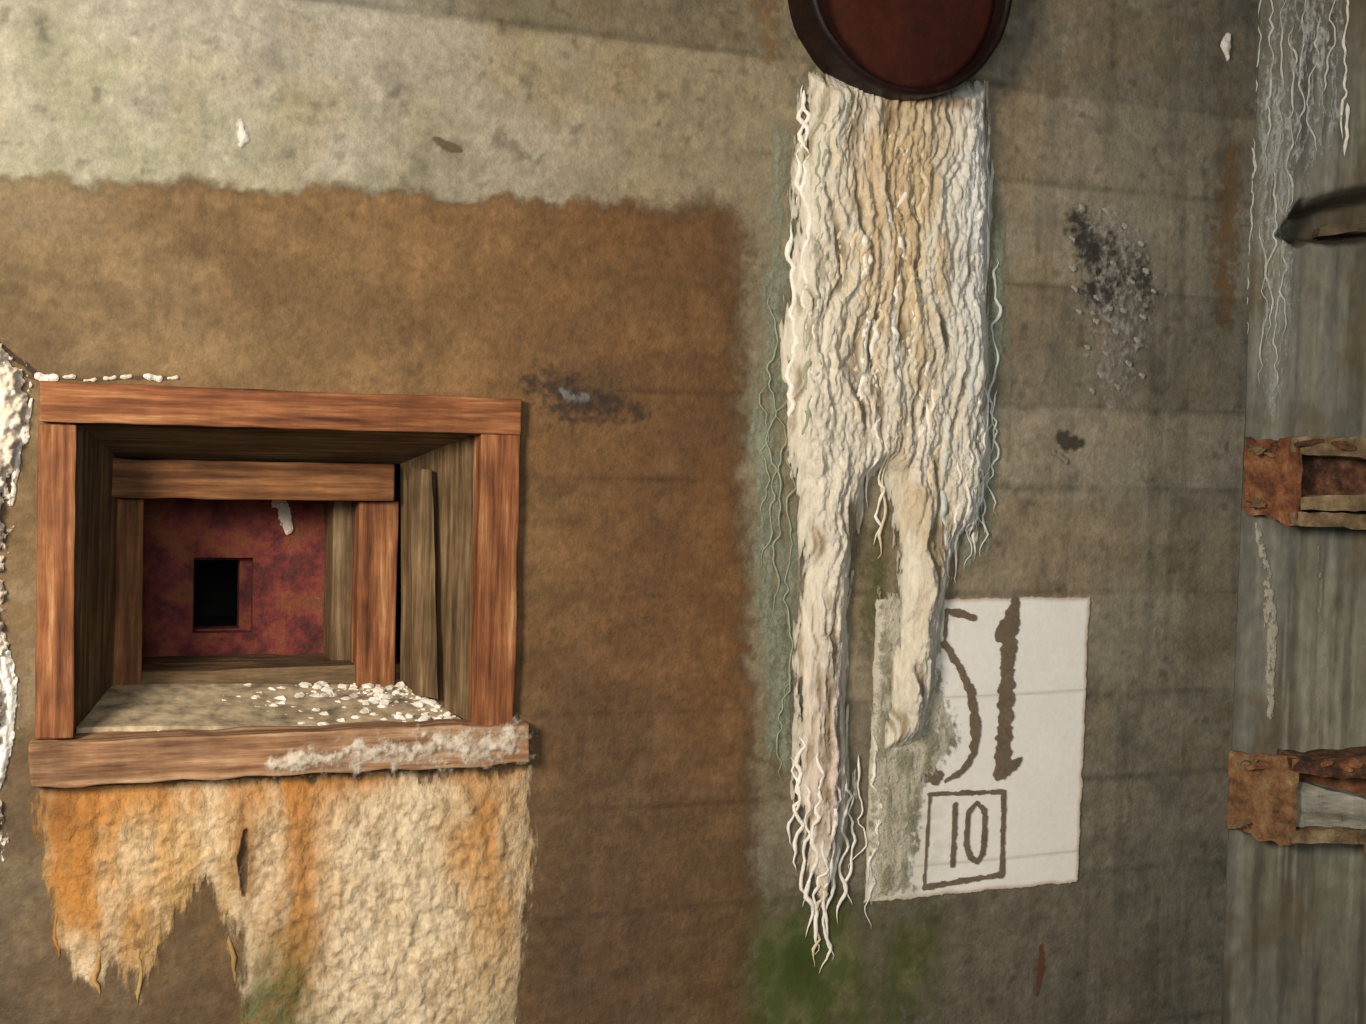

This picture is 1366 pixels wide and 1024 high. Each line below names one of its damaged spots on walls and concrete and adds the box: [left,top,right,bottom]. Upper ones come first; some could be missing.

efflorescence [1247,0,1350,412]
crack [0,342,179,382]
corrosion [1248,439,1356,457]
water stain [0,72,1011,1024]
corrosion [1320,759,1363,772]